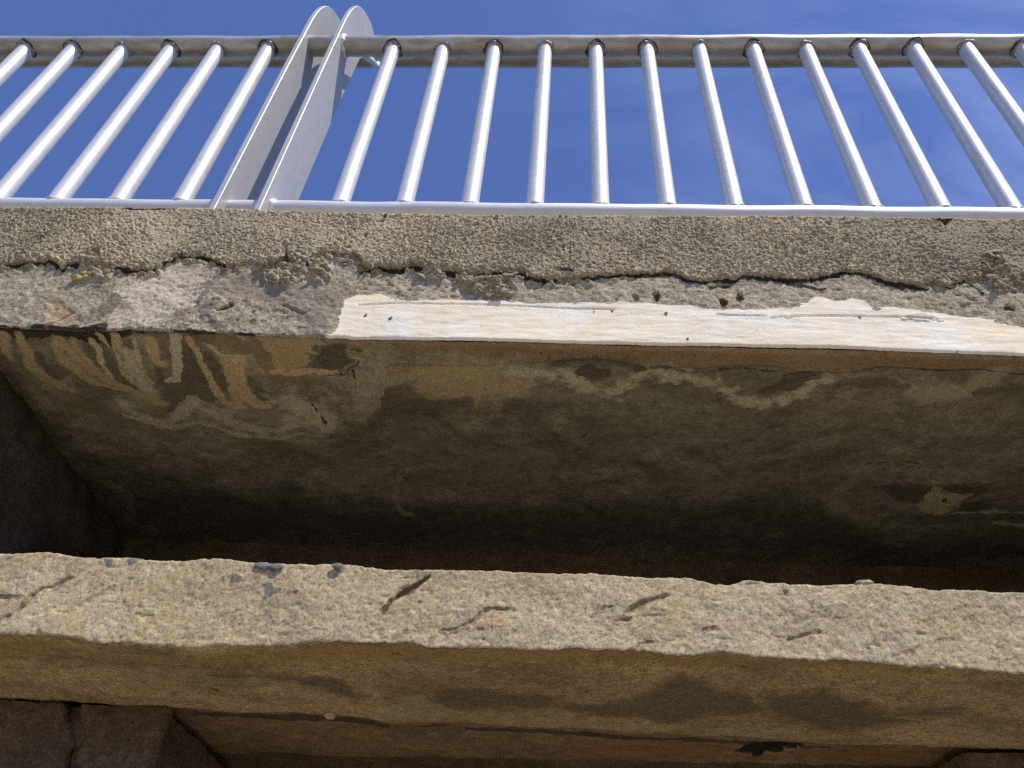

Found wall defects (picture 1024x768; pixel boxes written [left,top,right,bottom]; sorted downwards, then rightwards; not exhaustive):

crack [4,235,80,272]
crack [115,253,226,276]
spalling [252,251,365,288]
spalling [417,266,525,299]
spalling [982,246,1018,294]
water stain [0,259,1024,570]